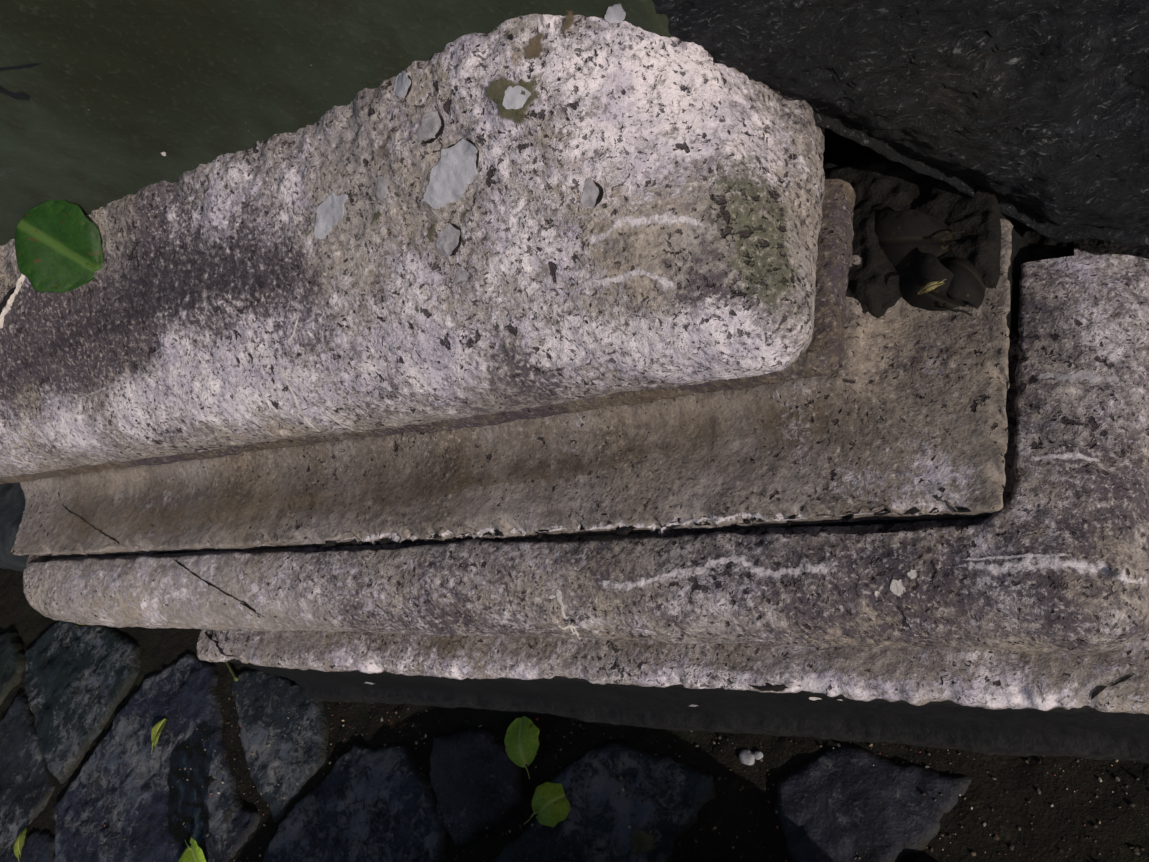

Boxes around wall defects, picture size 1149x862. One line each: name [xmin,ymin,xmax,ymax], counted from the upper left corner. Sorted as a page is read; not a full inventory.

spalling [524,33,544,59]
peeling [394,70,412,99]
peeling [502,86,531,109]
peeling [413,111,479,209]
peeling [580,179,604,208]
peeling [314,193,348,239]
peeling [436,223,462,258]
crack [0,274,26,329]
crack [63,505,127,550]
crack [173,559,266,618]
damp [599,555,837,591]
damp [959,553,1147,584]